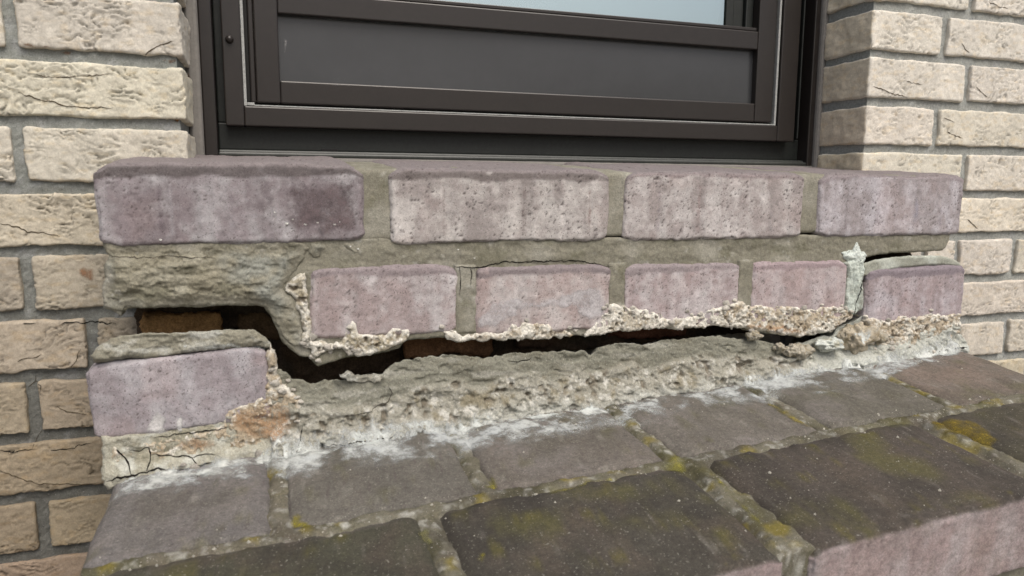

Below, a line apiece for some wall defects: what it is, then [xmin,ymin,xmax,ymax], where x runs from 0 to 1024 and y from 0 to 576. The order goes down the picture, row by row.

crack [455,260,613,290]
spalling [285,273,410,363]
spalling [439,298,962,354]
damp [673,337,960,406]
spalling [143,344,304,469]
crack [0,428,224,485]
damp [116,398,665,495]